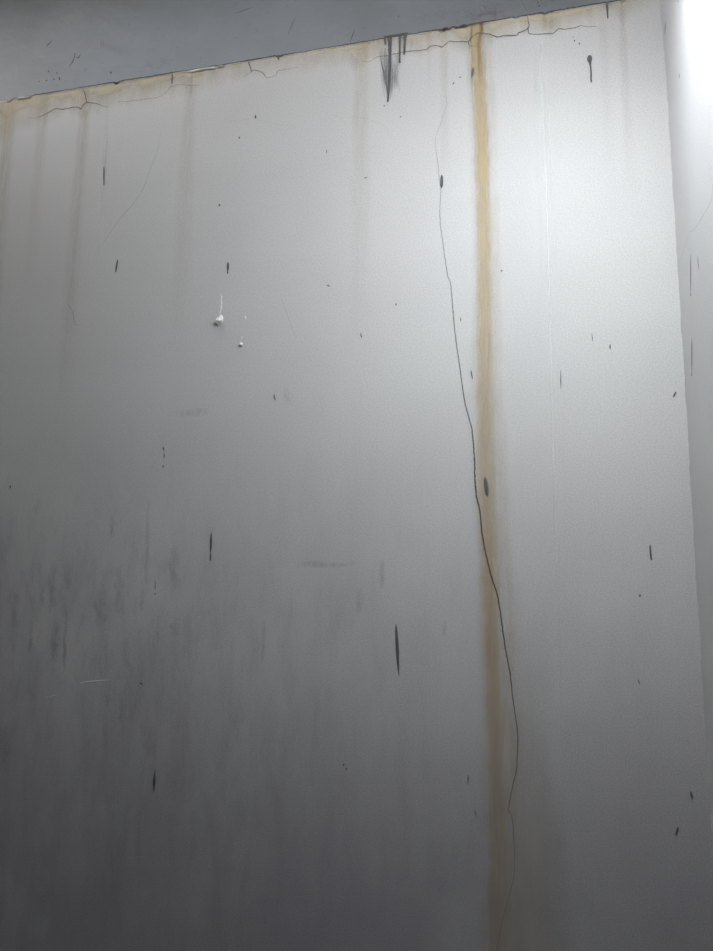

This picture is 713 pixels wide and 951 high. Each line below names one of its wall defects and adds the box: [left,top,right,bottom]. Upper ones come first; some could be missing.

crack [8,0,621,114]
rust [471,23,488,373]
crack [446,268,518,808]